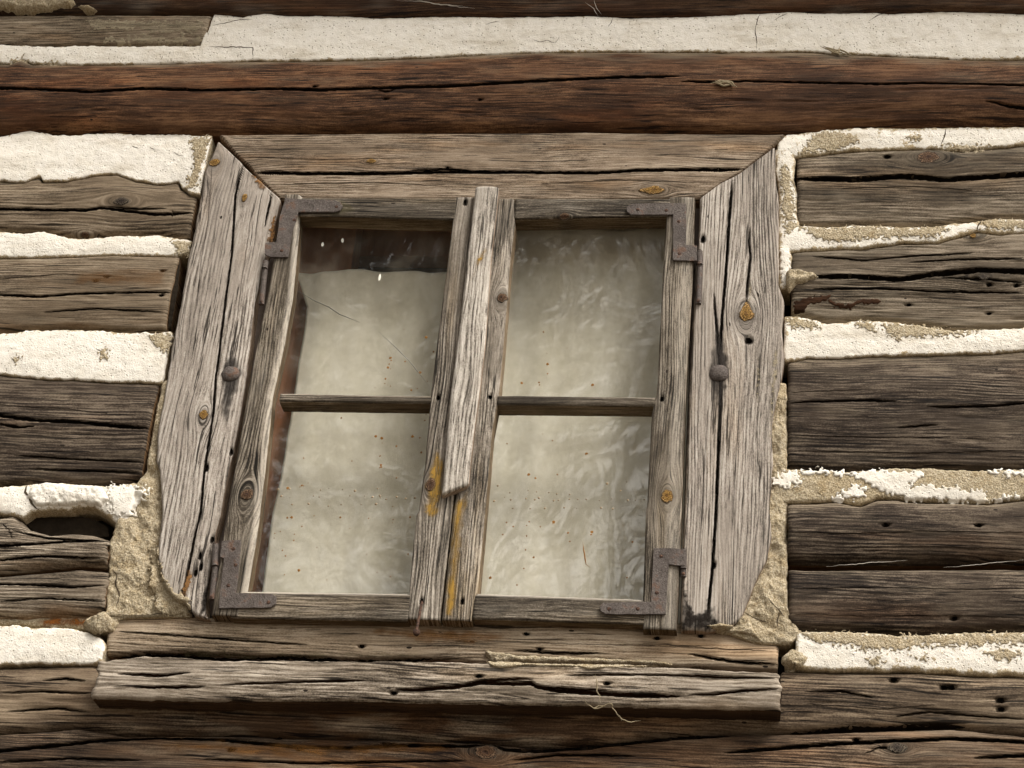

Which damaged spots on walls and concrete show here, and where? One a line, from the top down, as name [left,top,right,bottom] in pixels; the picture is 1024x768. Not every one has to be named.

crack [0,75,1024,109]
crack [0,157,751,689]
spalling [26,481,153,538]
peeling [771,466,1024,505]
crack [397,640,781,698]